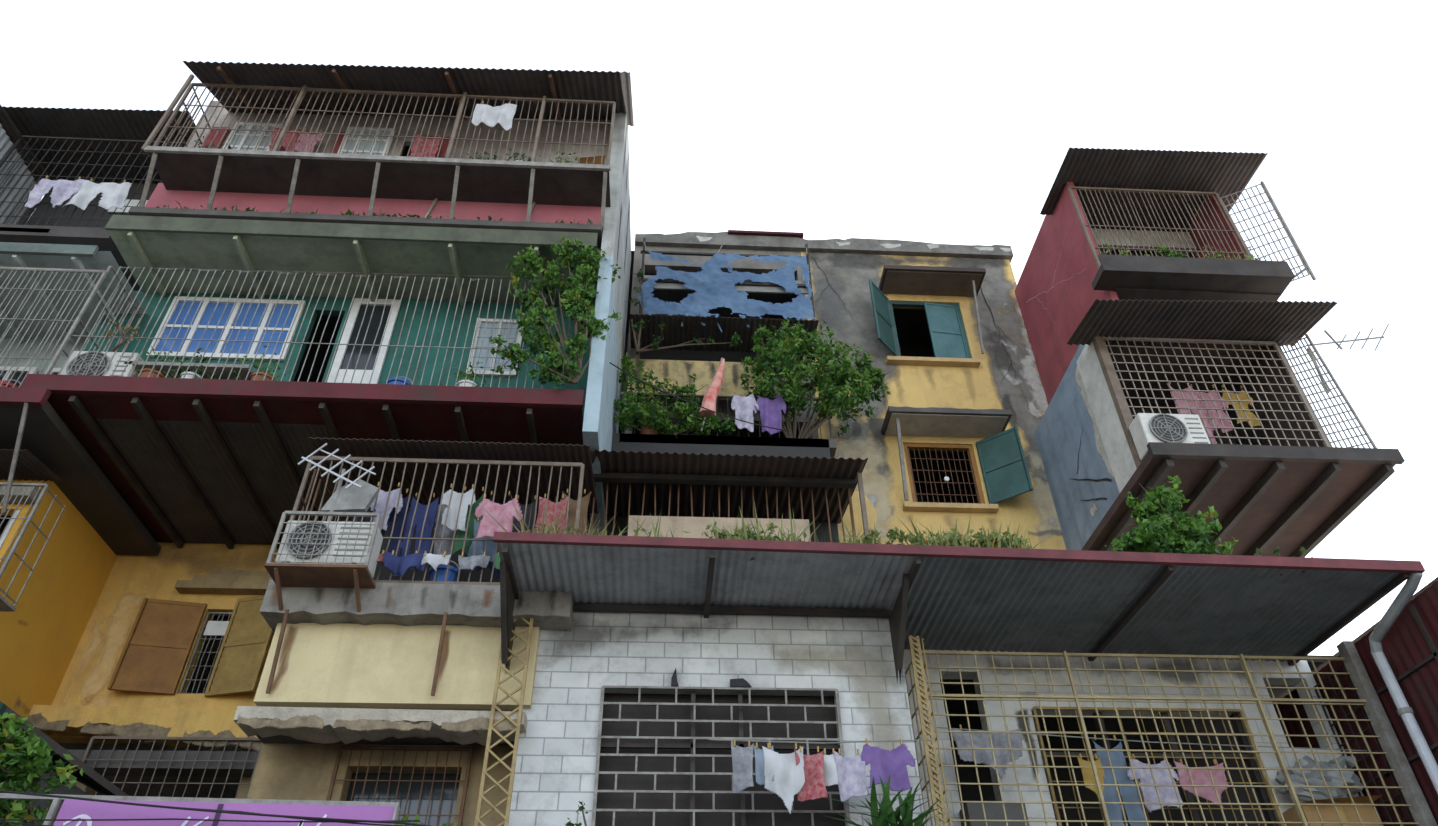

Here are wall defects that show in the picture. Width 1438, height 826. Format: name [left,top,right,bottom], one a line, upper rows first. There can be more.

peeling [1001,303,1049,418]
peeling [1025,453,1062,538]
spalling [27,596,517,751]
damp [557,622,632,653]